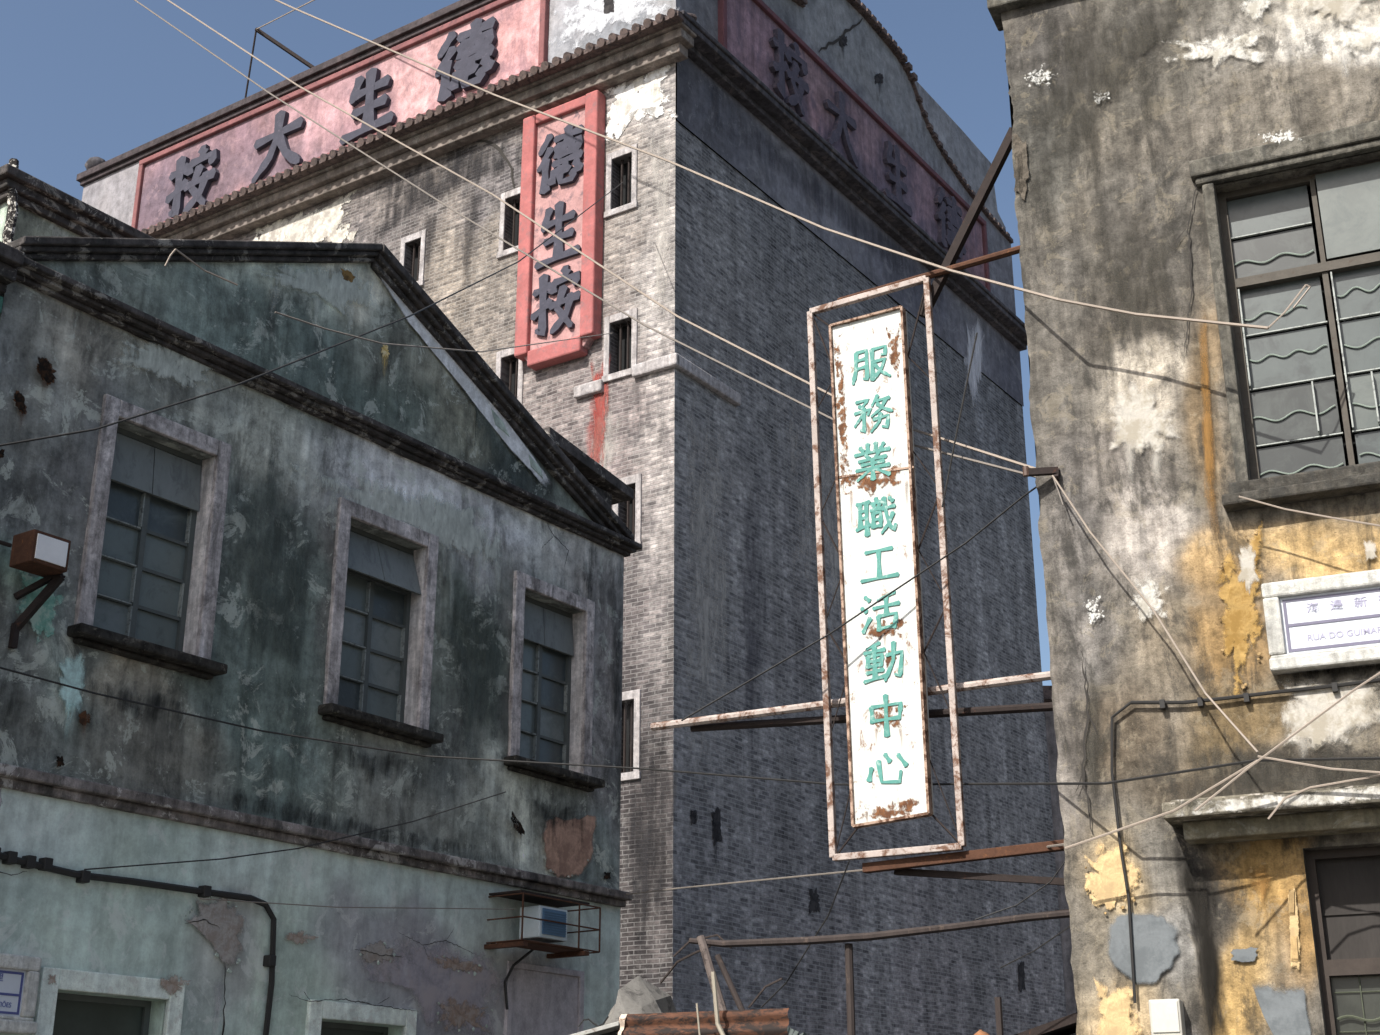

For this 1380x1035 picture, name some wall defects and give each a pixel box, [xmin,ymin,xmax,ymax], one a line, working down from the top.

water stain [1302,0,1380,50]
rust [886,323,903,383]
rust [833,335,905,497]
water stain [316,477,501,560]
peeling [1218,521,1262,695]
rust [857,798,919,820]
spalling [543,815,597,878]
peeling [1084,842,1141,915]
peeling [1095,981,1142,1035]